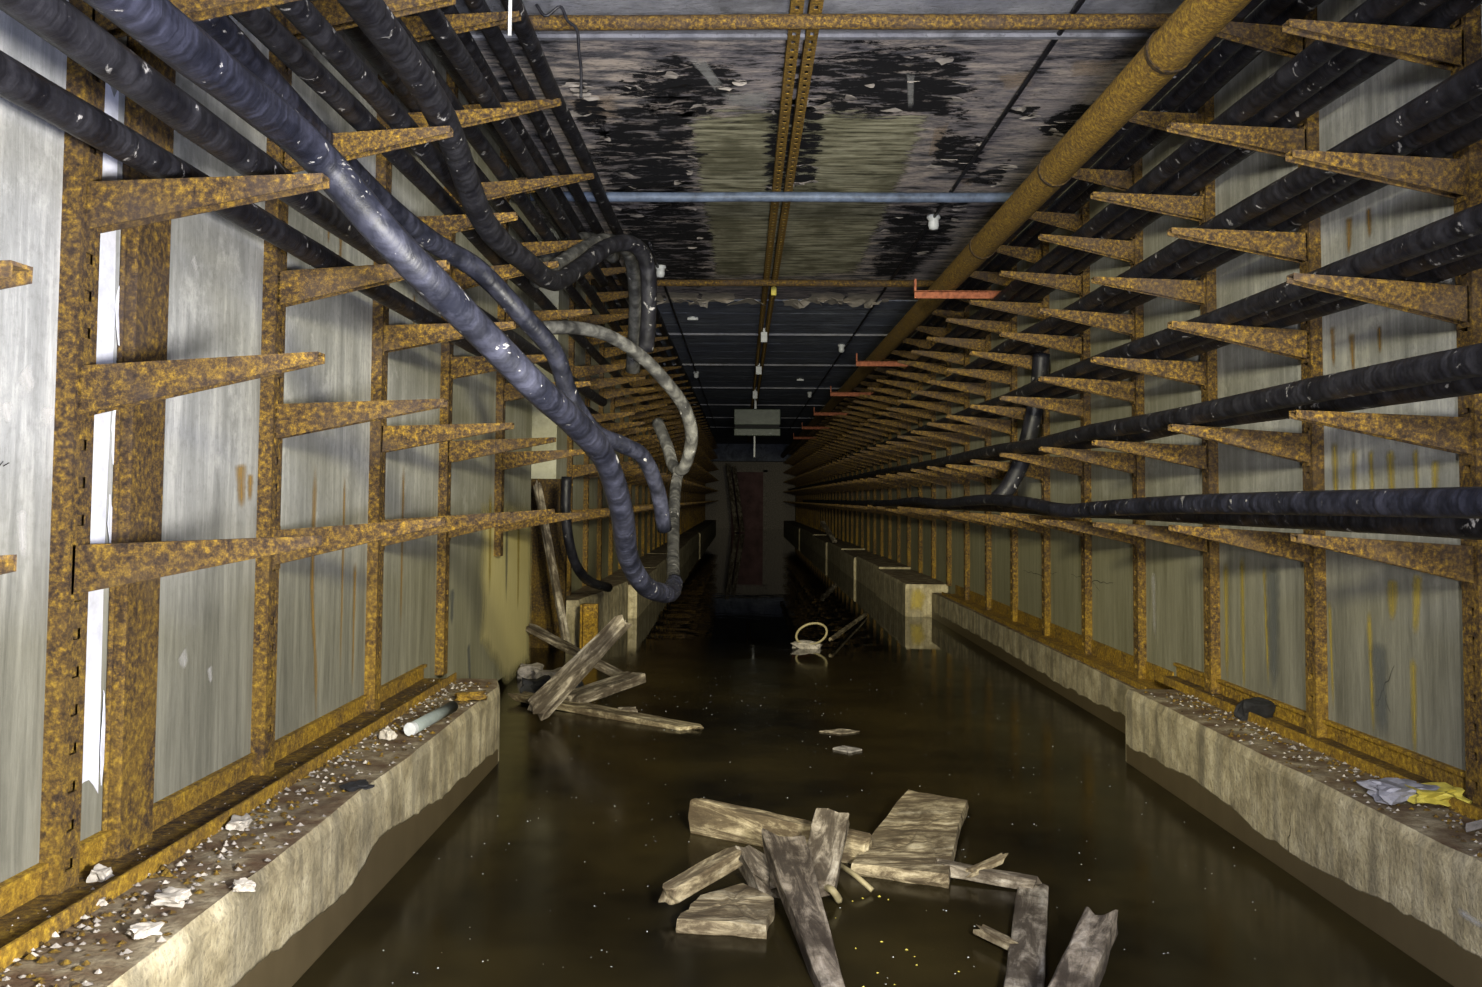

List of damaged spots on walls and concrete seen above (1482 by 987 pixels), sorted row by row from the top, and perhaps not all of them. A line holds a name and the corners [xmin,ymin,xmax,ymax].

corrosion [1347,209,1370,249]
corrosion [1331,329,1354,366]
corrosion [238,466,252,502]
corrosion [1334,446,1393,490]
corrosion [480,502,531,678]
corrosion [1225,565,1245,673]